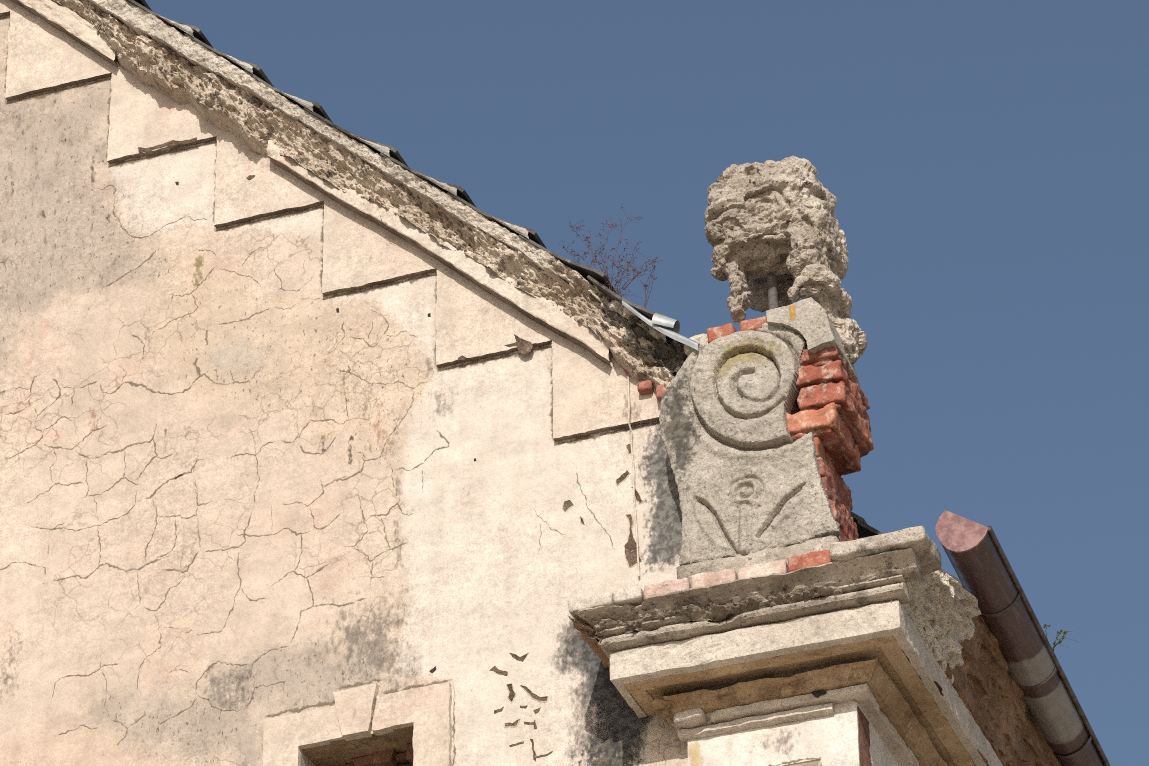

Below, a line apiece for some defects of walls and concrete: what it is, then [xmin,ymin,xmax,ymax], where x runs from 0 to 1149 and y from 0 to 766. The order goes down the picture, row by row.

crack [99,185,205,286]
spalling [53,0,677,389]
crack [0,247,449,745]
spalling [490,666,553,761]
damp [558,625,652,764]
spalling [891,569,1062,766]